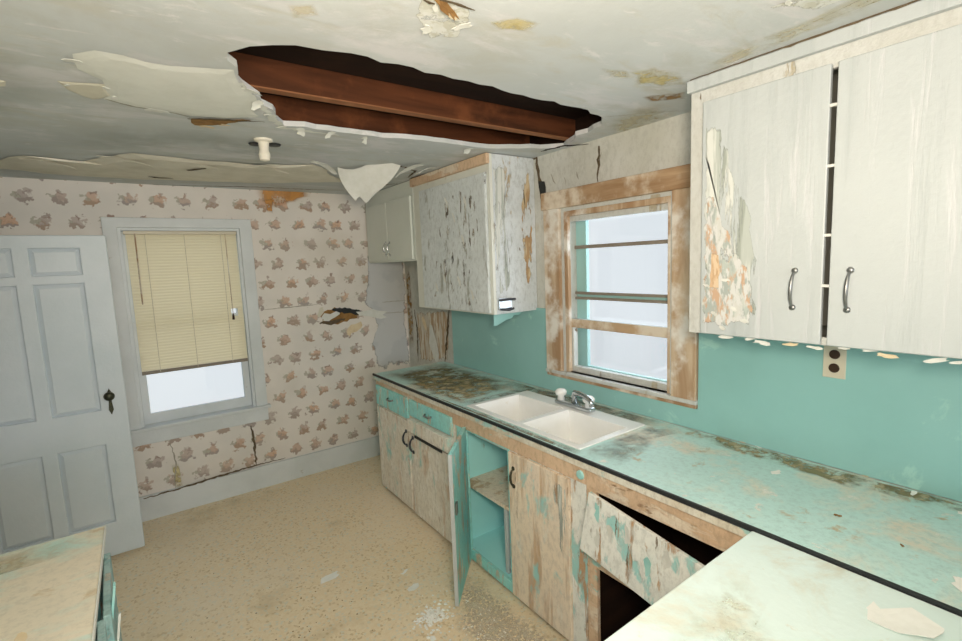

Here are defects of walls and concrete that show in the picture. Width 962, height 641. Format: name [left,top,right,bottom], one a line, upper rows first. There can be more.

peeling [416,0,475,38]
peeling [58,50,337,139]
hole [317,307,387,336]
crack [143,426,284,499]